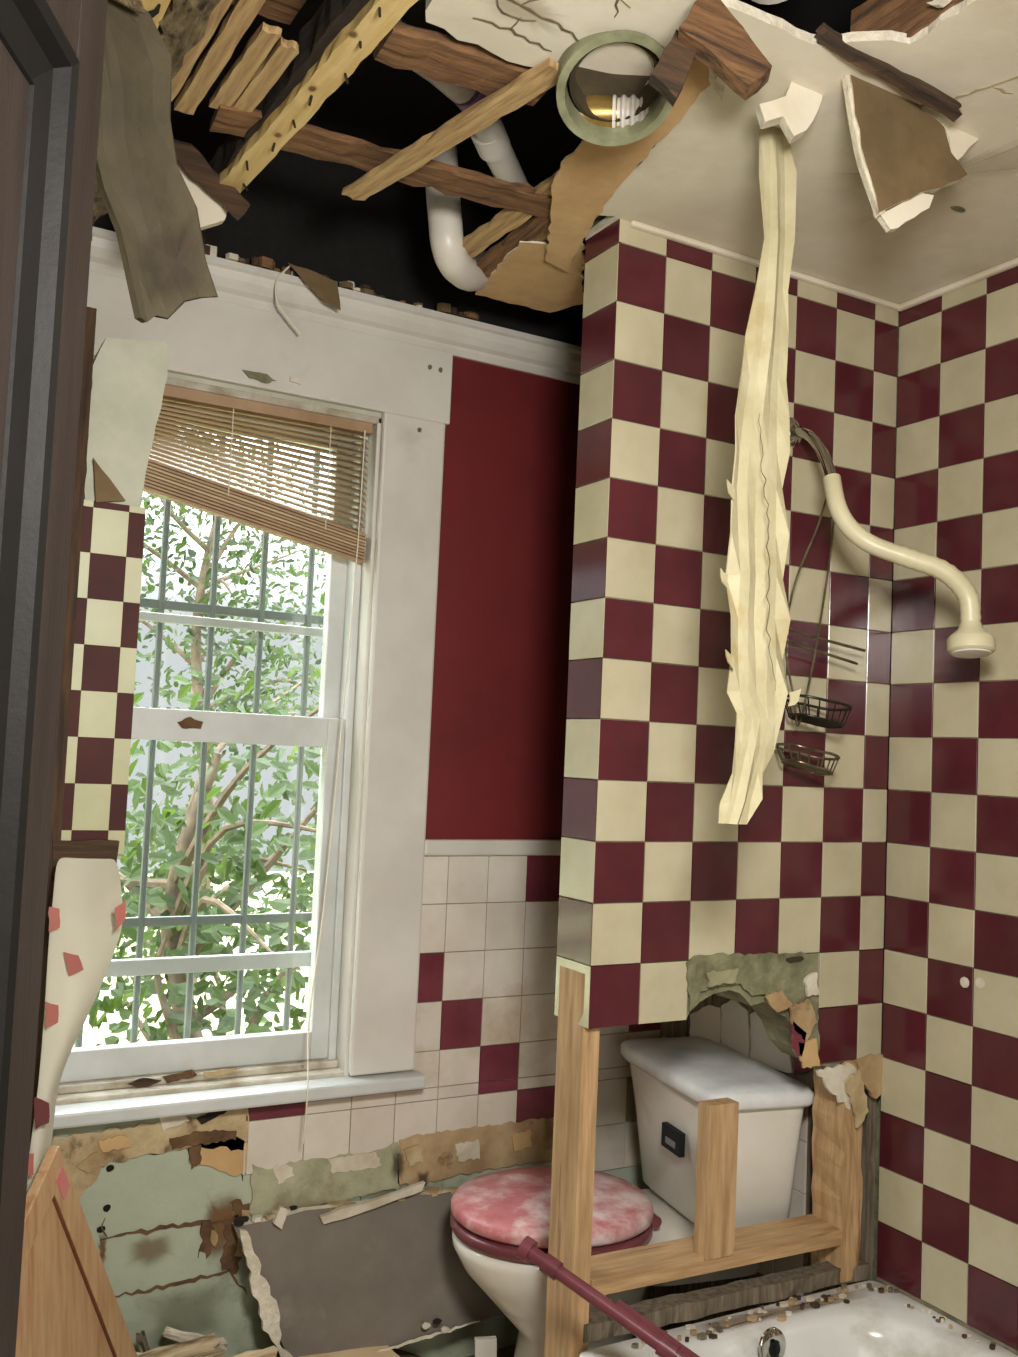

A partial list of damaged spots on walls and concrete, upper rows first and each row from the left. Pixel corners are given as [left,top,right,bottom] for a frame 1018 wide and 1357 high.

crack [473,0,579,52]
spalling [177,160,228,230]
spalling [686,951,884,1128]
spalling [52,1108,554,1274]
peeling [422,1318,450,1333]